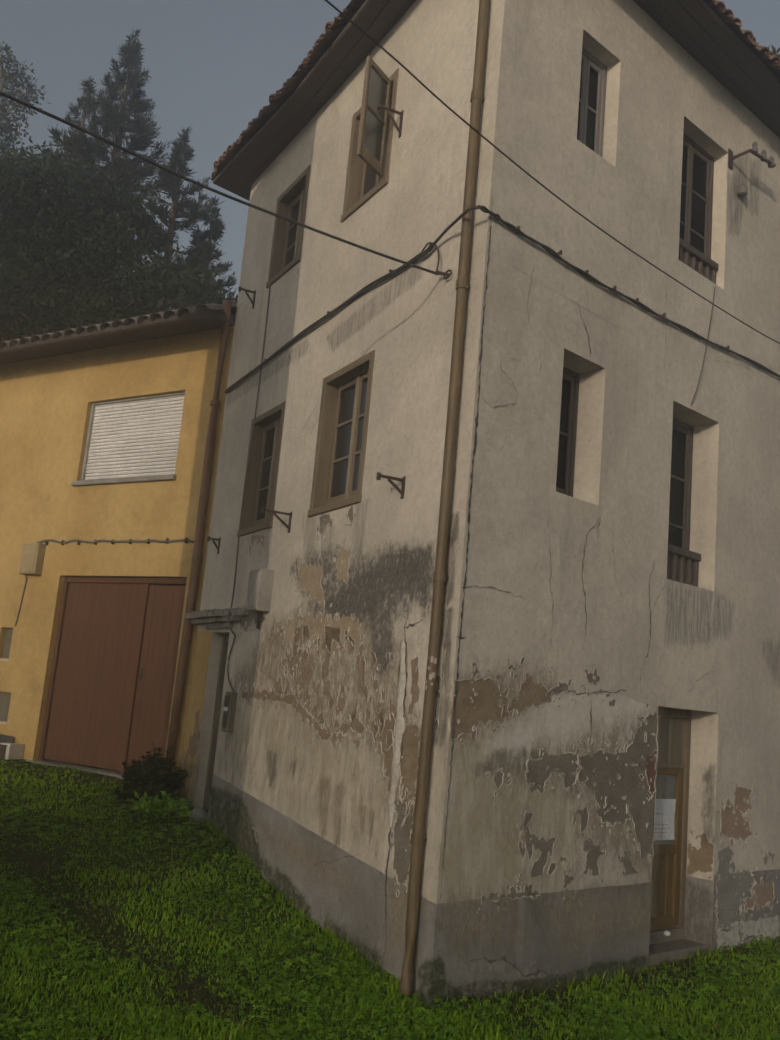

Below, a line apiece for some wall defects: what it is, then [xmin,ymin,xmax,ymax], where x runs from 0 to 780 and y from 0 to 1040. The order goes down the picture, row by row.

water stain [234,546,454,780]
peeling [236,504,658,913]
crack [440,194,542,898]
crack [582,517,623,645]
crack [553,566,664,741]
flaking render [686,779,780,952]